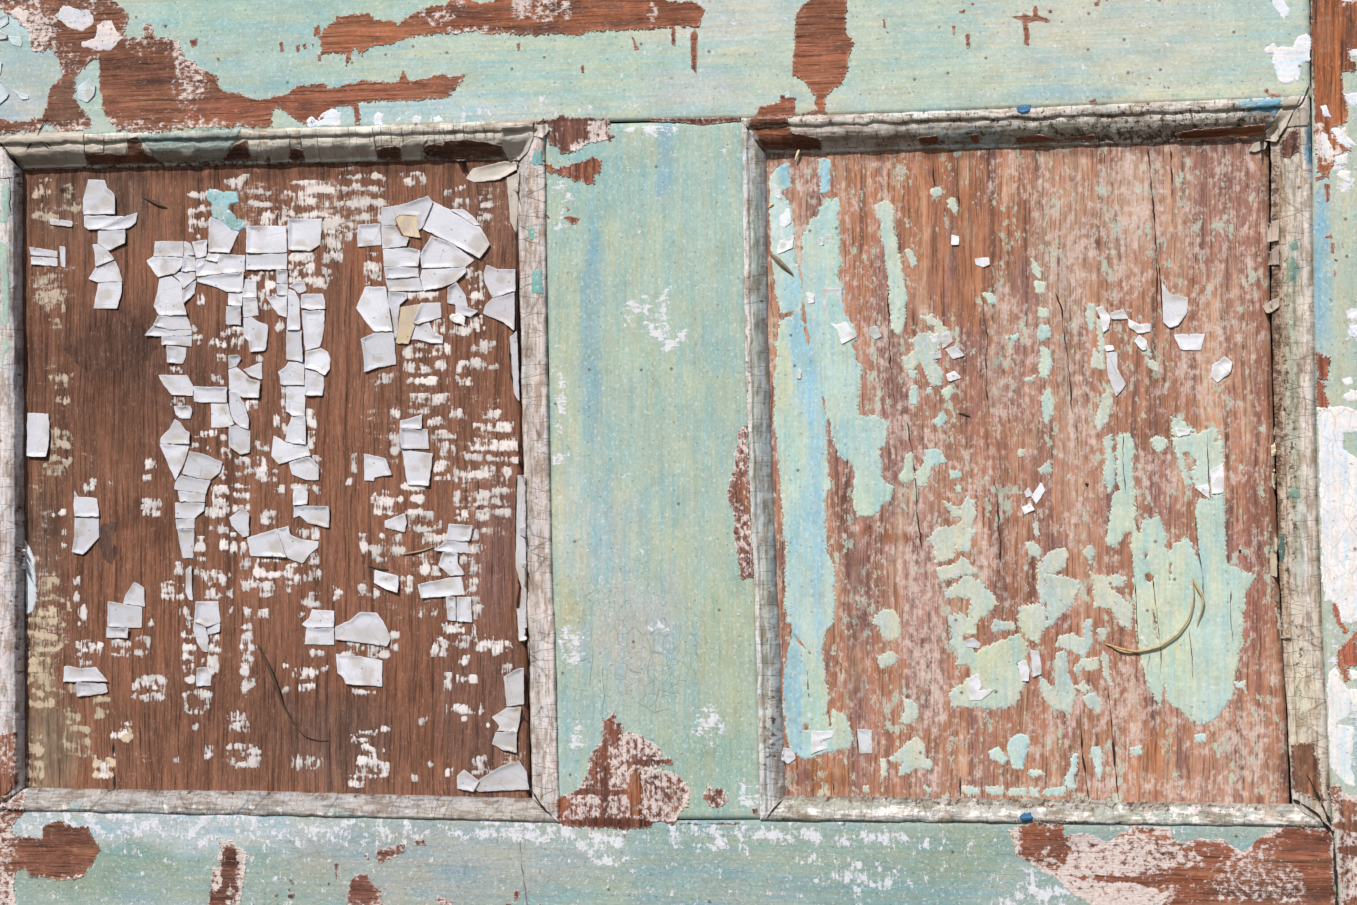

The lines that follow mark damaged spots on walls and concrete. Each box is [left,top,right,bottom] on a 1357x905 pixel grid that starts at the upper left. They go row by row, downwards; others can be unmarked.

crack [0,117,86,212]
peeling [0,0,615,309]
peeling [279,0,706,74]
peeling [648,0,855,151]
peeling [1175,0,1357,202]
peeling [356,196,520,400]
peeling [145,217,331,686]
peeling [0,732,101,905]
peeling [302,609,391,687]
peeling [457,668,529,792]
peeling [556,710,739,838]
peeling [1007,351,1357,905]